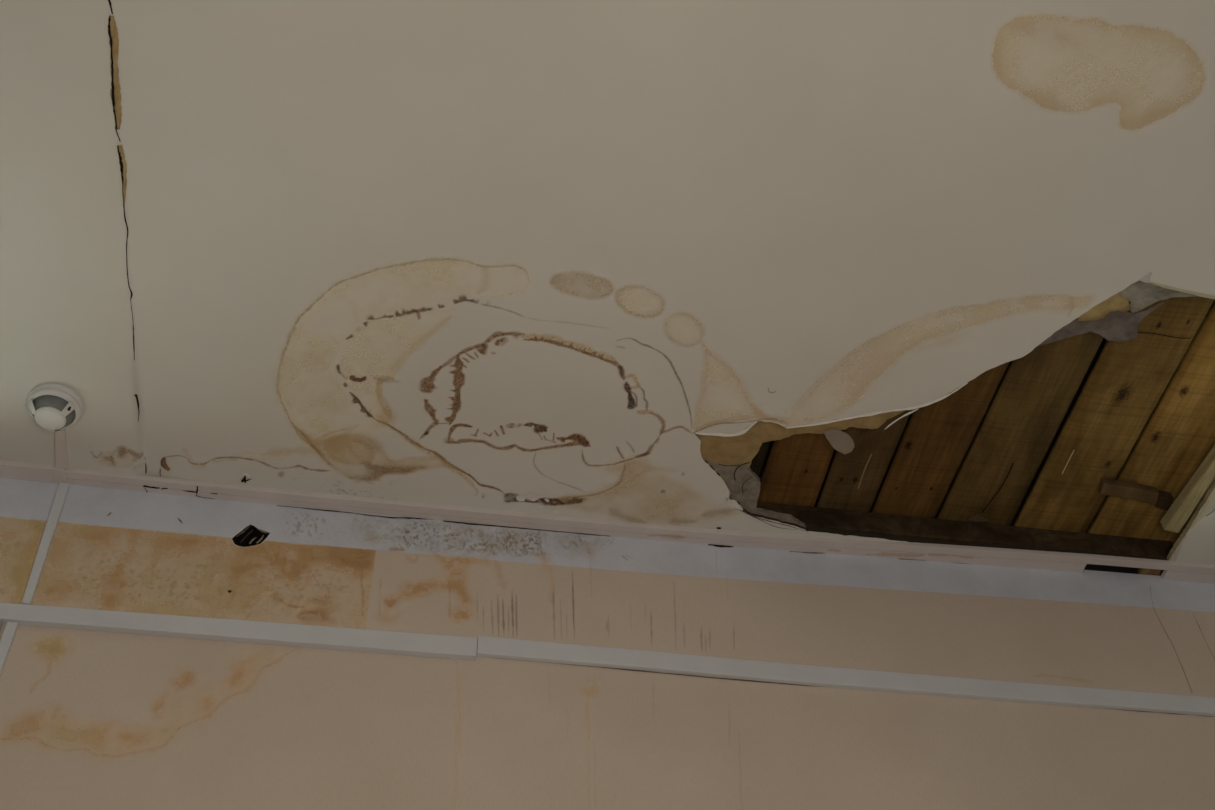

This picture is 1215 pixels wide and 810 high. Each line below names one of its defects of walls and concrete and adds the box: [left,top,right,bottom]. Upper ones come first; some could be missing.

crack [108,0,135,360]
leakage [364,298,476,326]
leakage [291,422,424,480]
leakage [337,333,666,492]
flaking render [697,410,906,528]
leakage [154,533,376,620]